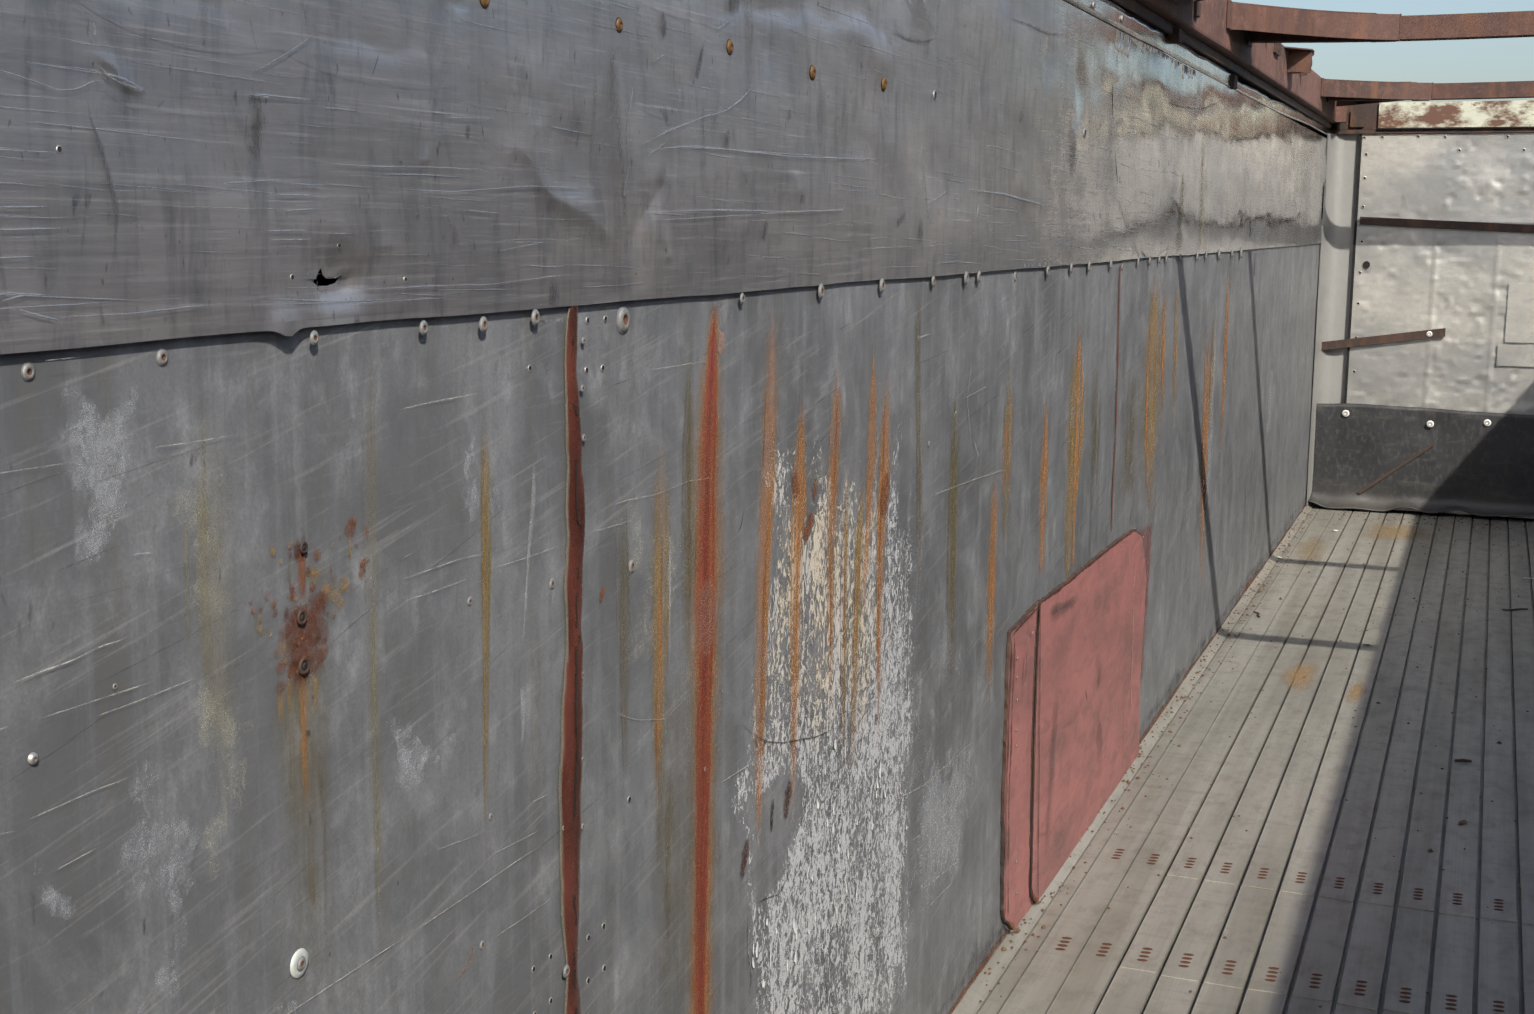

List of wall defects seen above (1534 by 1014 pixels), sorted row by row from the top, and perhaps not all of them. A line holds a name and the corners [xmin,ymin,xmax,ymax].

rust [252,542,368,781]
rust [695,323,724,1014]
rust [791,430,890,694]
rust [1016,355,1135,631]